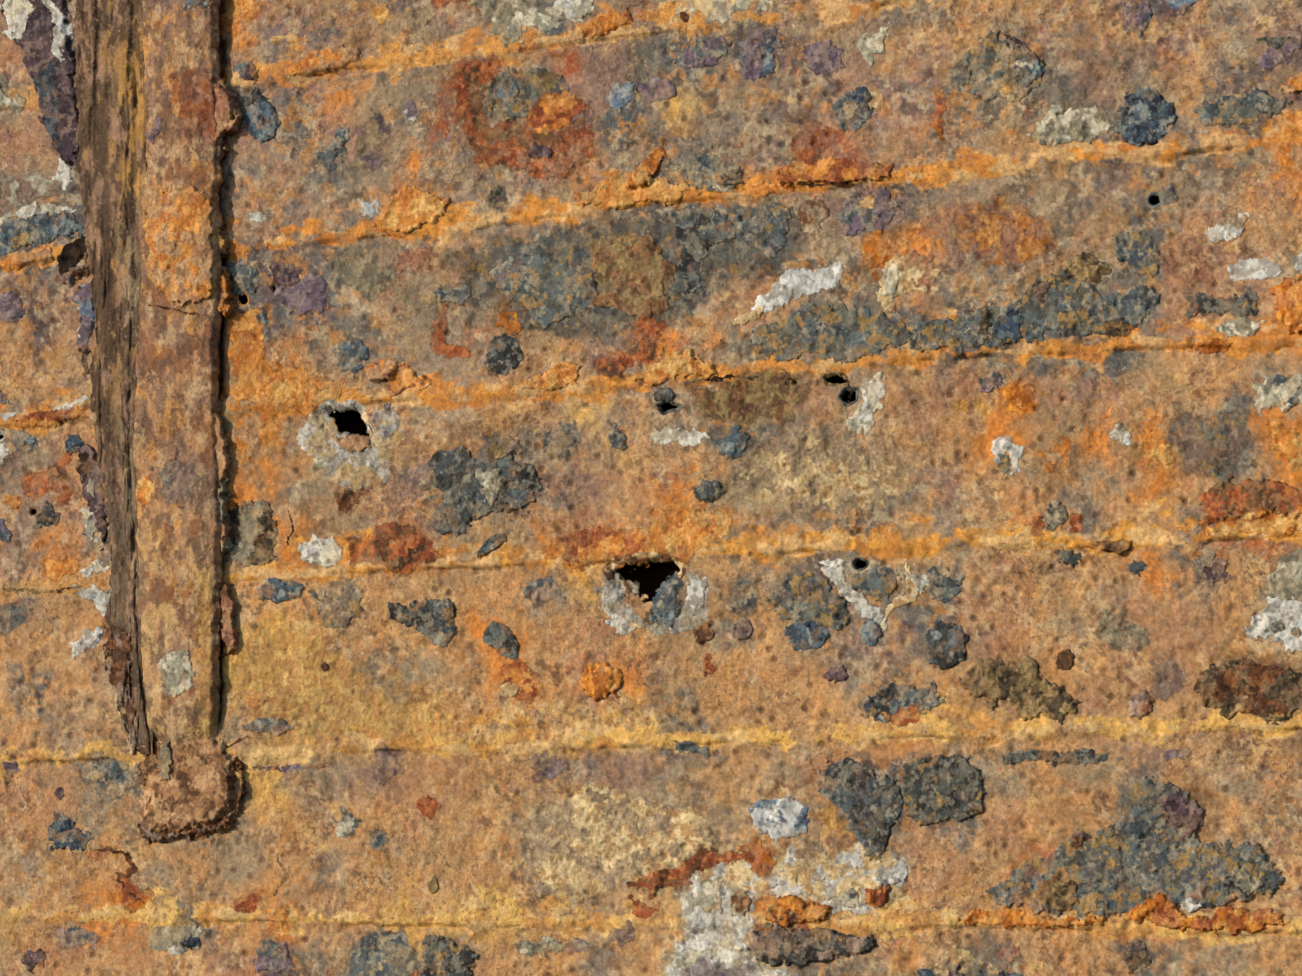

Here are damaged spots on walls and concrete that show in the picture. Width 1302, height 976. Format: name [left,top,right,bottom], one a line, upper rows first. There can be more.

peeling [0,0,73,62]
corrosion [169,69,242,161]
corrosion [449,53,599,179]
corrosion [572,142,701,211]
corrosion [743,119,895,199]
corrosion [524,234,811,426]
corrosion [141,185,349,559]
corrosion [1197,417,1302,541]
corrosion [347,522,445,576]
corrosion [958,654,1083,726]
corrosion [1194,657,1302,725]
corrosion [1123,893,1290,974]